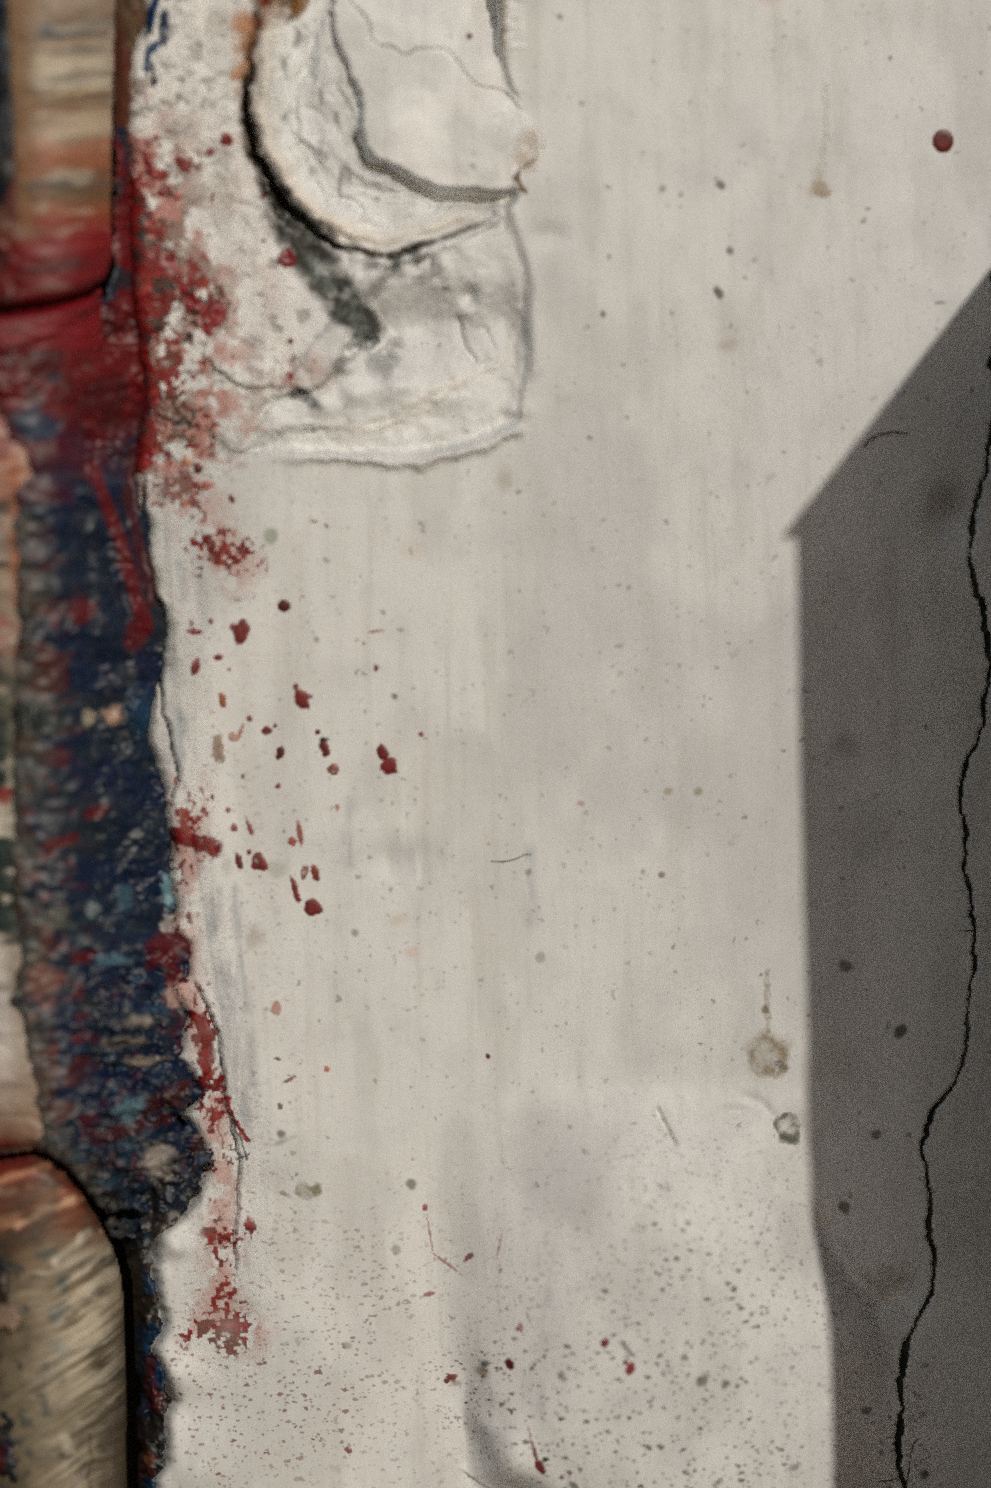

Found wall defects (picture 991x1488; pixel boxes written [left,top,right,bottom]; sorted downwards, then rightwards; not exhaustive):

rust [233,0,309,216]
rust [512,173,527,193]
crack [883,425,991,1488]
peeling [109,1175,201,1488]